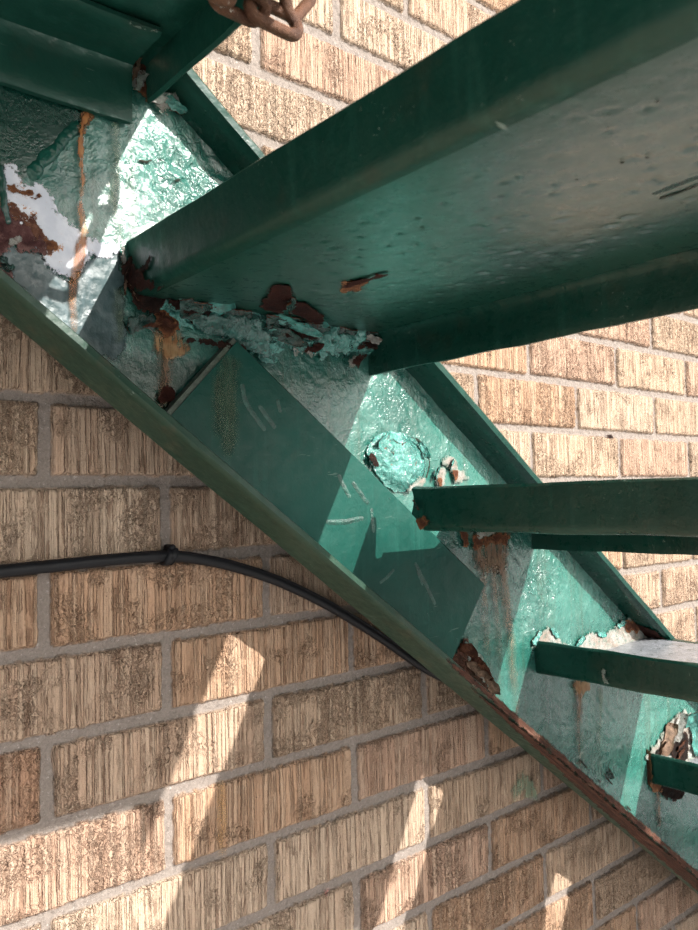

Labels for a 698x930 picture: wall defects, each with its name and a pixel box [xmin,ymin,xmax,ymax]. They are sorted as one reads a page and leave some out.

rust [0,184,58,279]
rust [71,111,94,285]
peeling [0,163,382,368]
rust [126,310,190,406]
rust [459,531,512,639]
peeling [531,618,646,650]
rust [446,636,698,890]
spalling [659,786,685,802]
peeling [658,712,698,761]